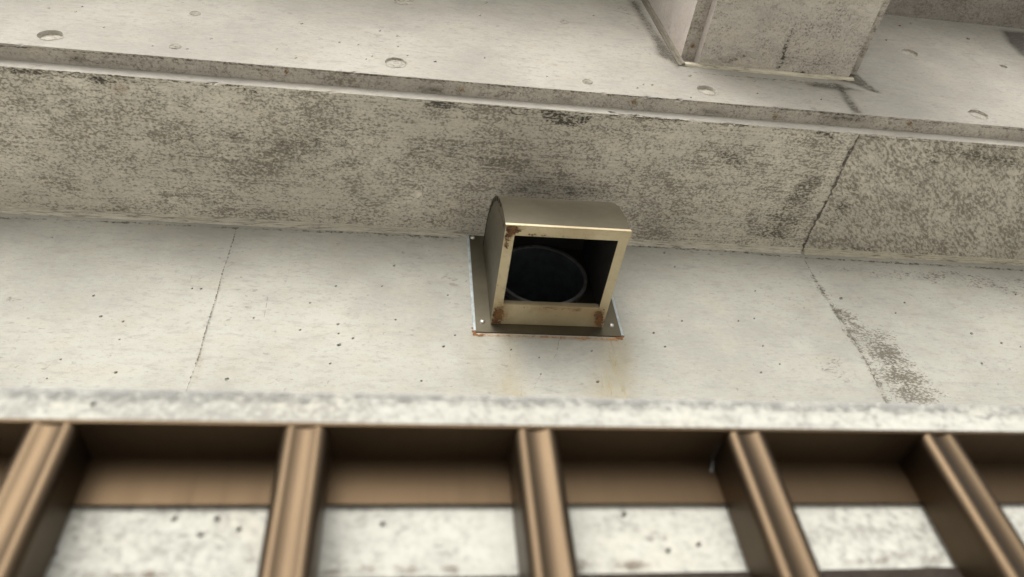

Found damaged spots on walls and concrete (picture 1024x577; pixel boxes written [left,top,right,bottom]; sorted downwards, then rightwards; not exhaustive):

crack [803,136,887,403]
water stain [1,387,290,403]
water stain [354,304,1024,415]